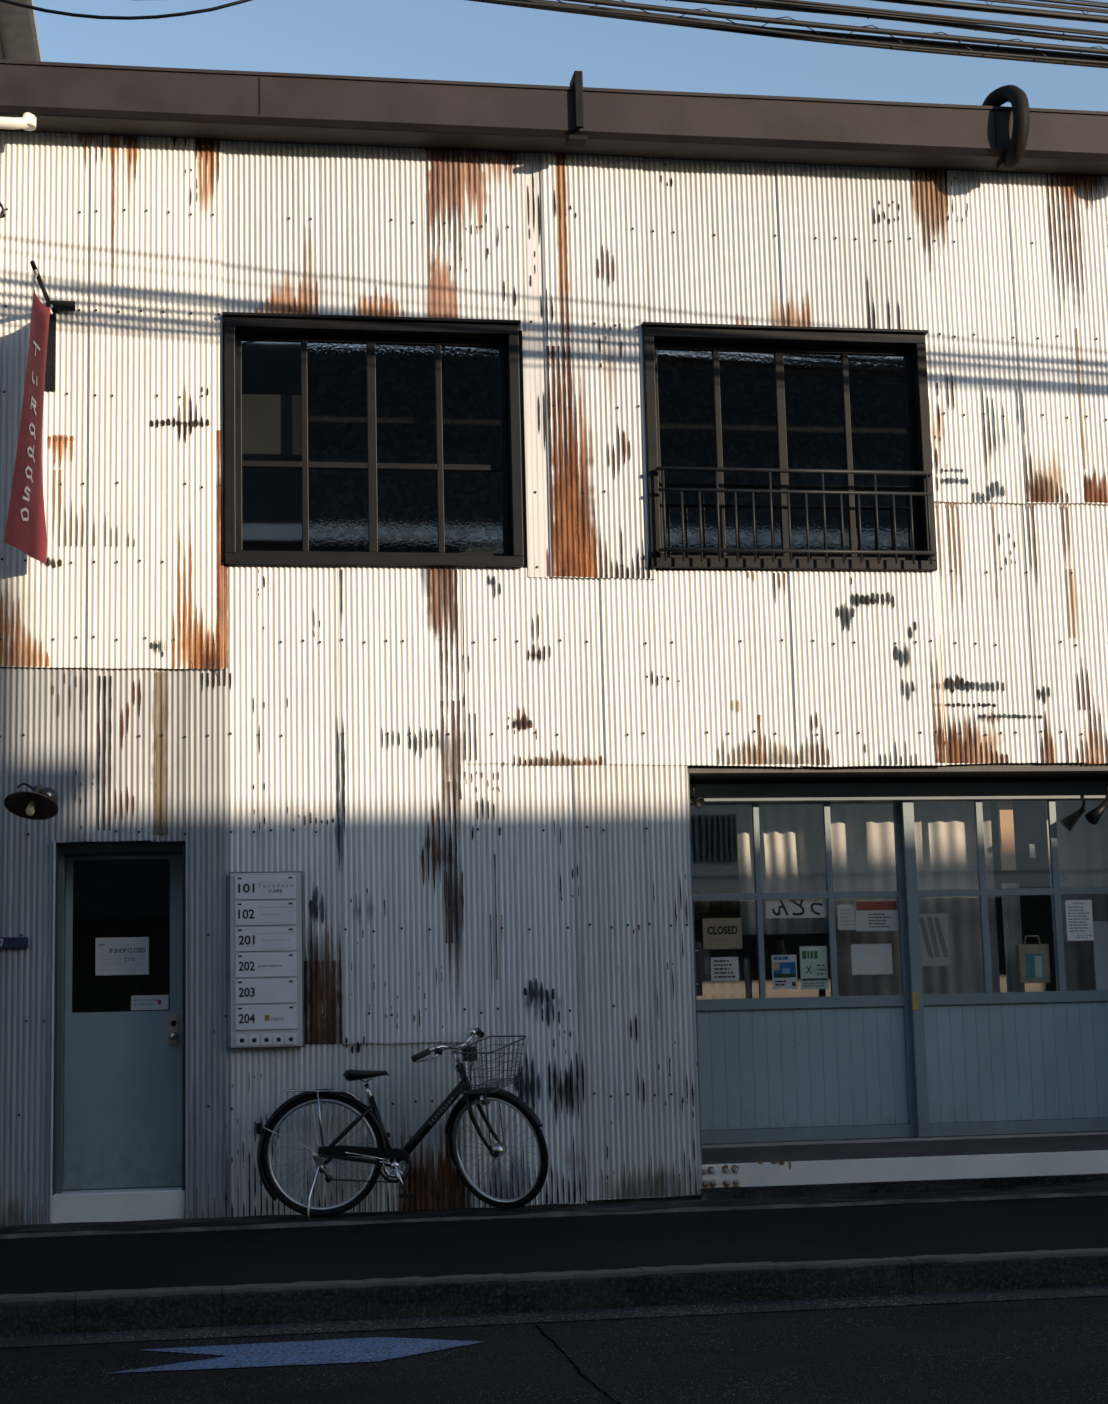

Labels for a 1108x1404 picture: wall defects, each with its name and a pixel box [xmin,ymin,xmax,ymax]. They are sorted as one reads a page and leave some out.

rust [256,228,318,314]
rust [354,286,405,317]
rust [426,148,518,318]
rust [538,154,598,577]
rust [910,168,948,271]
rust [1025,174,1108,585]
rust [0,582,49,667]
rust [172,430,228,686]
rust [421,567,464,977]
rust [932,634,1009,763]
rust [304,886,343,1044]
crack [535,1325,621,1404]